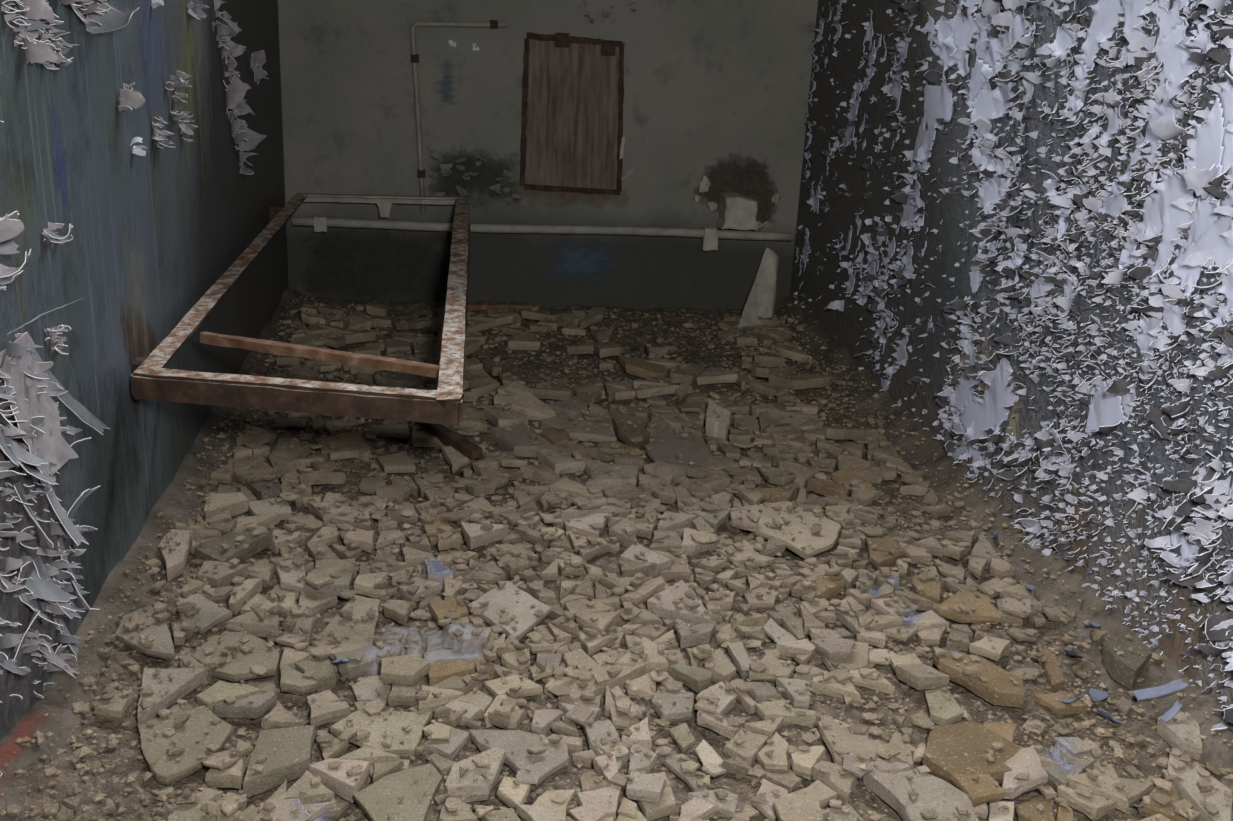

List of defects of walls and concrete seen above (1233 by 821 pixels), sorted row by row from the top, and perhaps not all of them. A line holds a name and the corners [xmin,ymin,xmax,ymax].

peeling [1,0,164,70]
peeling [42,222,73,248]
peeling [0,324,110,729]